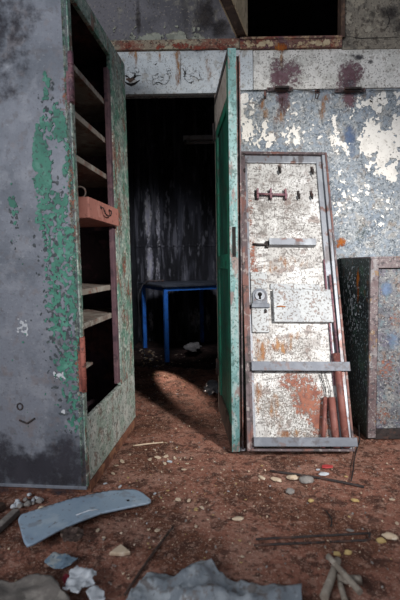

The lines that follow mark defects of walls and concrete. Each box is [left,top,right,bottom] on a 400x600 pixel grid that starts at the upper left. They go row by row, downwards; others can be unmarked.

rust [172,43,206,83]
rust [270,43,302,121]
rust [336,60,364,108]
peeling [240,91,400,183]
peeling [333,170,395,233]